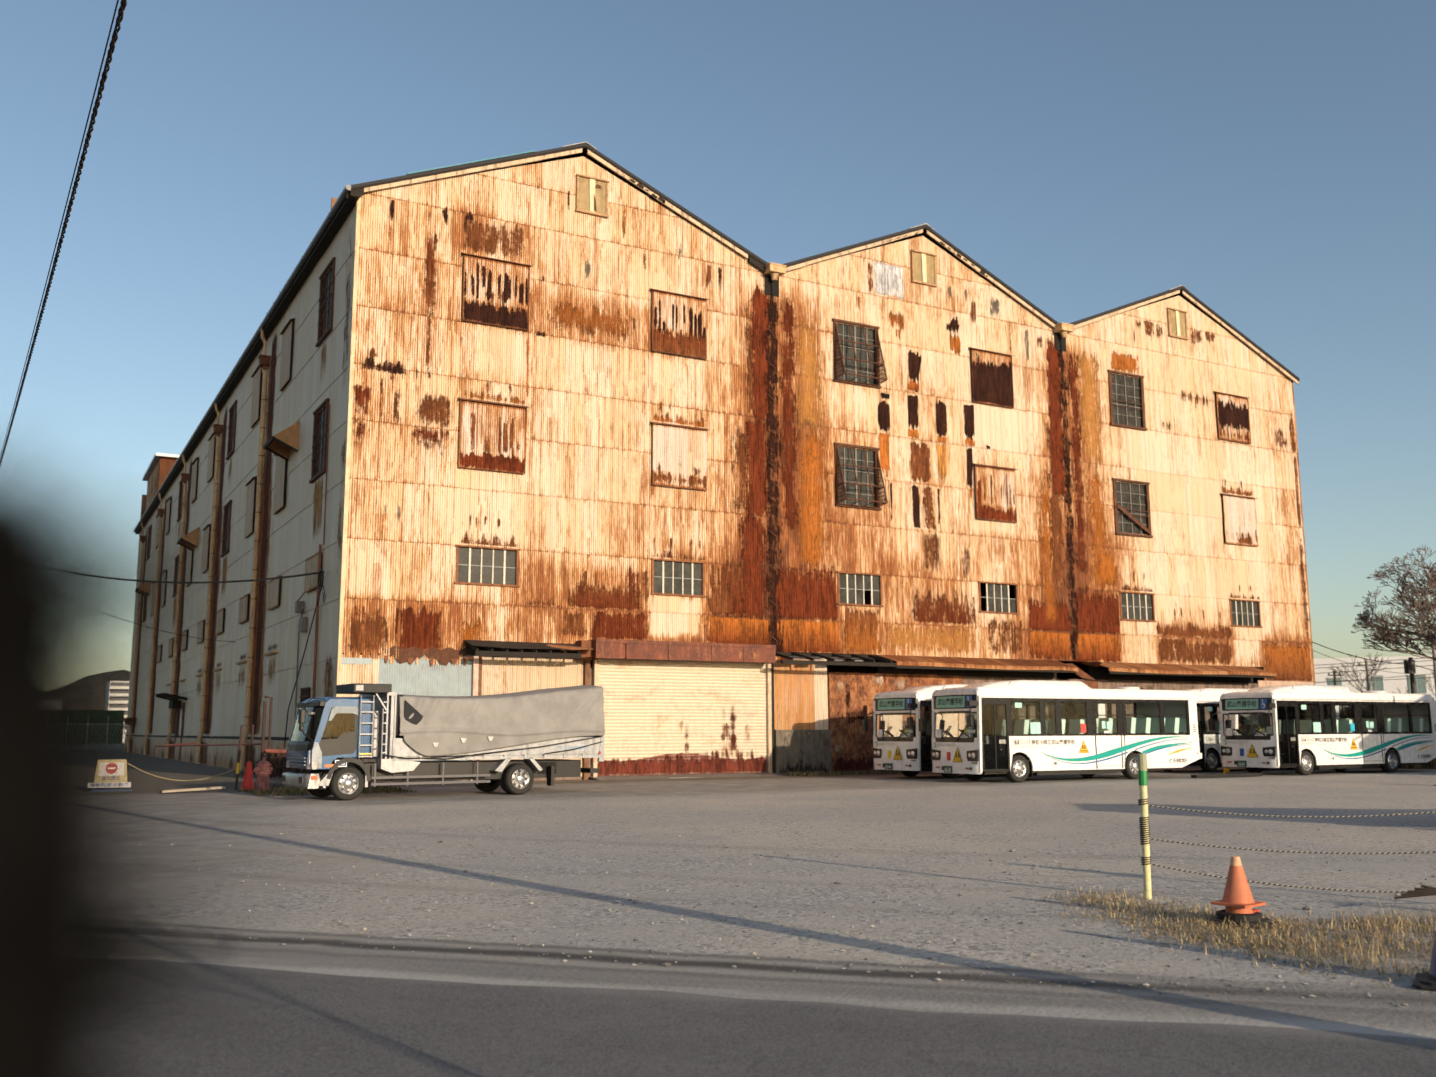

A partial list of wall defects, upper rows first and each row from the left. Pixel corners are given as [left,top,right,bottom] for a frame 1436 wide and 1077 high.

corrosion [313,207,636,553]
corrosion [1182,392,1249,443]
corrosion [530,263,1163,662]
corrosion [347,605,442,654]
corrosion [459,618,487,646]
corrosion [1156,608,1232,665]
corrosion [324,659,335,697]
corrosion [598,707,767,775]